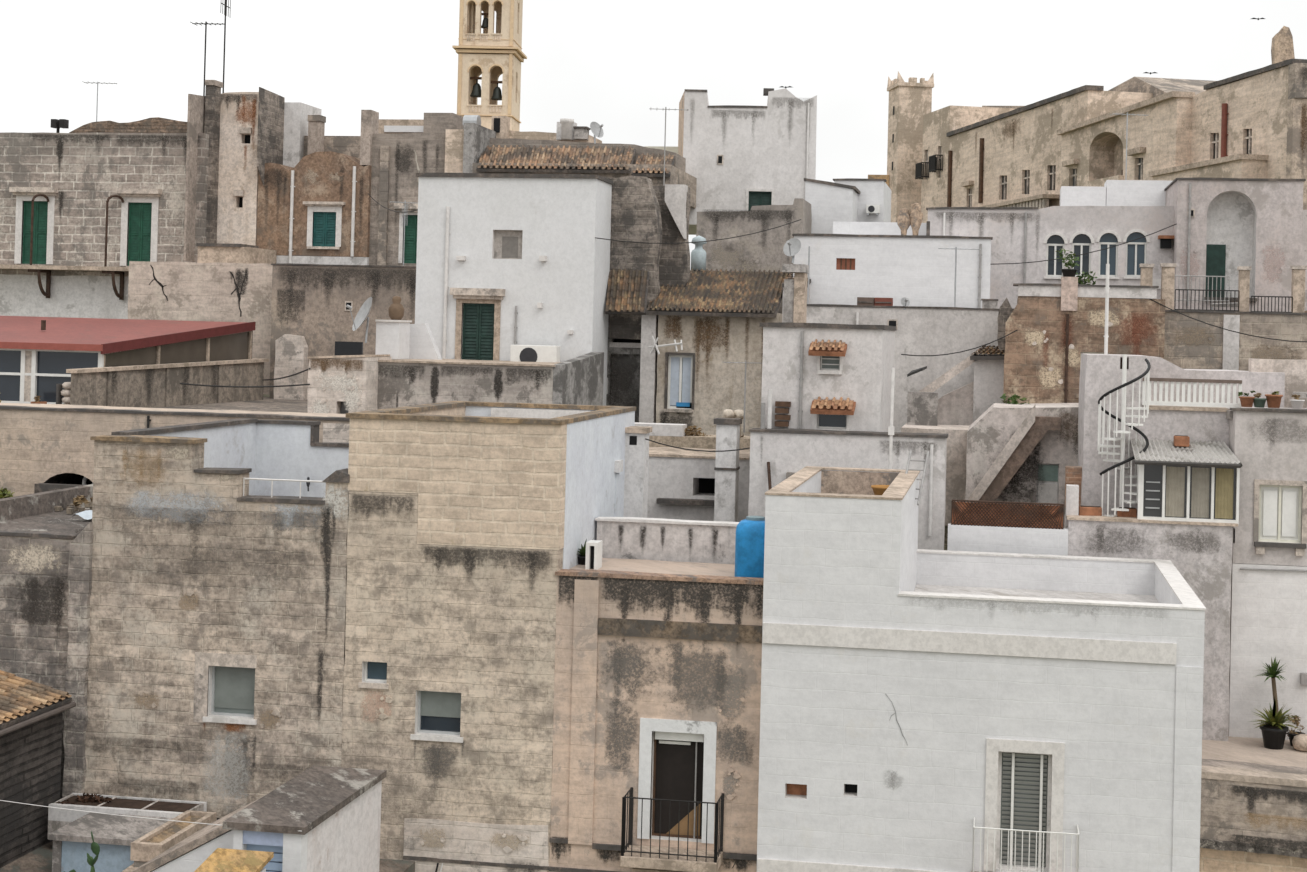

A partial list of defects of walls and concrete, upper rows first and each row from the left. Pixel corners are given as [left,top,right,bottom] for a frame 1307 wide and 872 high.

crack [149,265,168,301]
crack [229,271,245,317]
leakage [272,485,413,632]
leakage [425,547,548,582]
leakage [18,578,66,627]
leakage [559,576,763,625]
leakage [606,642,728,770]
leakage [718,724,752,763]